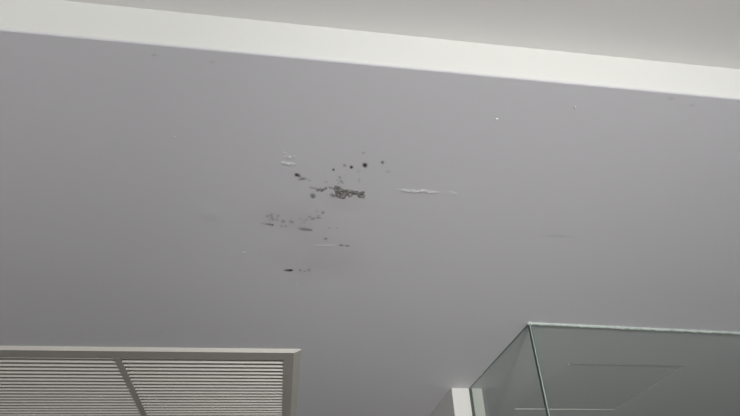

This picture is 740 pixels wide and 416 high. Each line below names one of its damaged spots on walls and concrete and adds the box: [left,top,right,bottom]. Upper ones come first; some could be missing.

spalling [310,186,365,199]